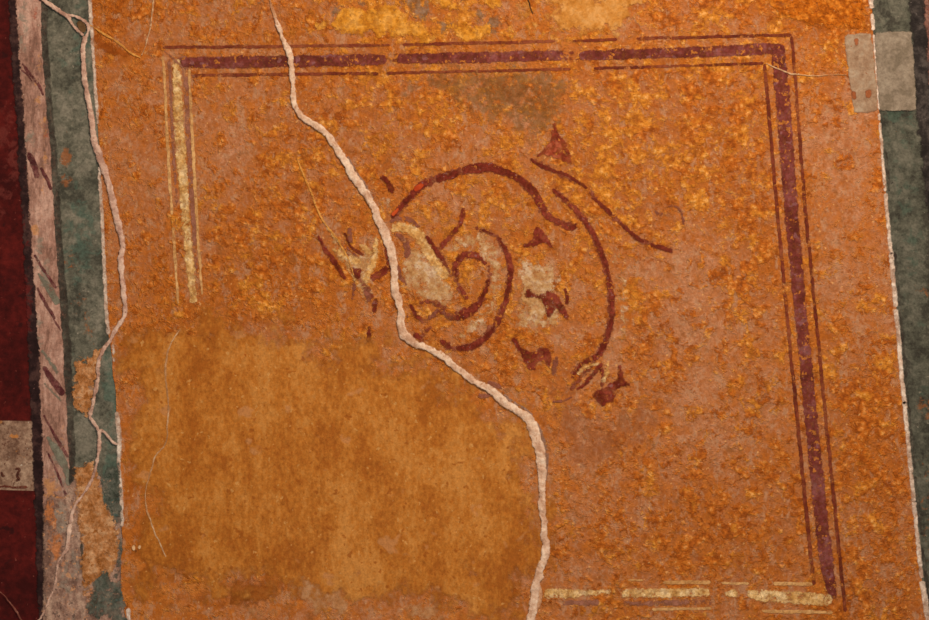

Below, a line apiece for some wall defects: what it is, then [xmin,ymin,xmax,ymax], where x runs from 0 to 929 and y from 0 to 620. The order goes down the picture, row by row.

crack [0,0,154,620]
peeling [71,348,102,418]
peeling [42,461,141,620]
crack [145,330,180,557]
crack [269,0,550,620]